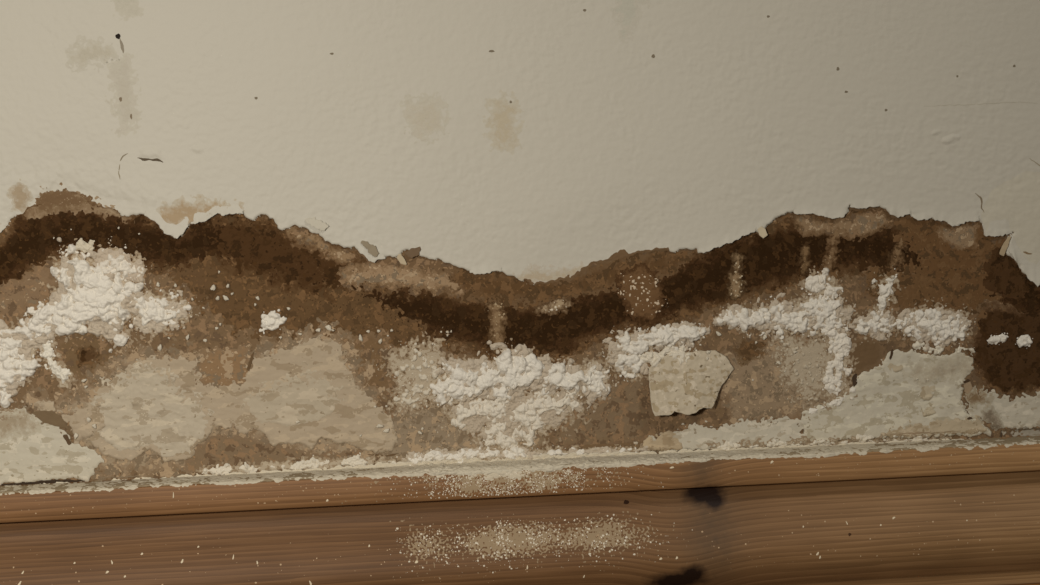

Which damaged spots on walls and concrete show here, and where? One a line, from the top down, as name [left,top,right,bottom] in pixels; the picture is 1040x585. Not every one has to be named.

peeling [0,197,1040,482]
water stain [0,191,1040,495]